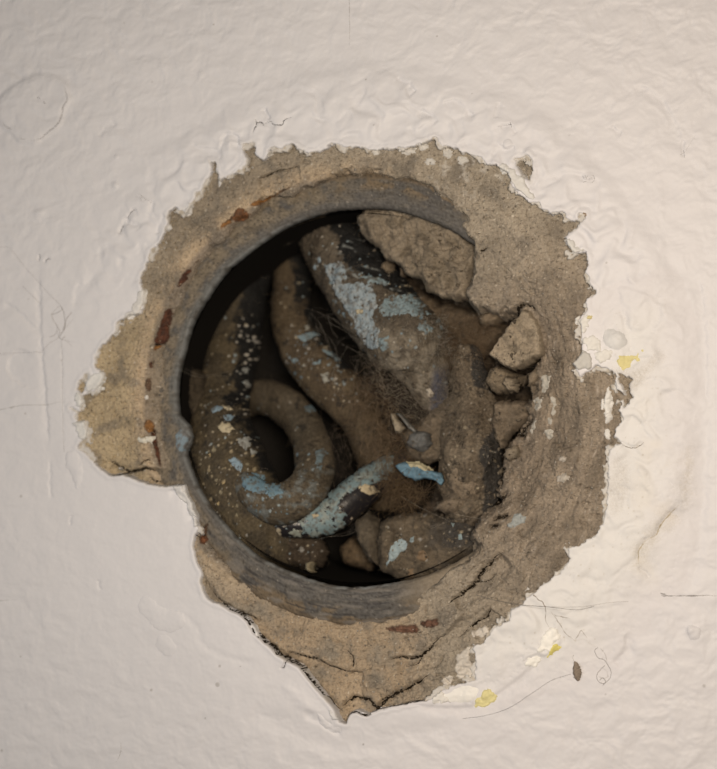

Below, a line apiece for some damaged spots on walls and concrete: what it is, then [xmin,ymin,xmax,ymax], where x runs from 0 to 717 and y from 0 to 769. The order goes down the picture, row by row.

rust [221,188,288,228]
rust [154,309,173,350]
flaking render [72,140,705,722]
crack [450,552,503,603]
rust [388,619,438,633]
crack [213,591,491,718]